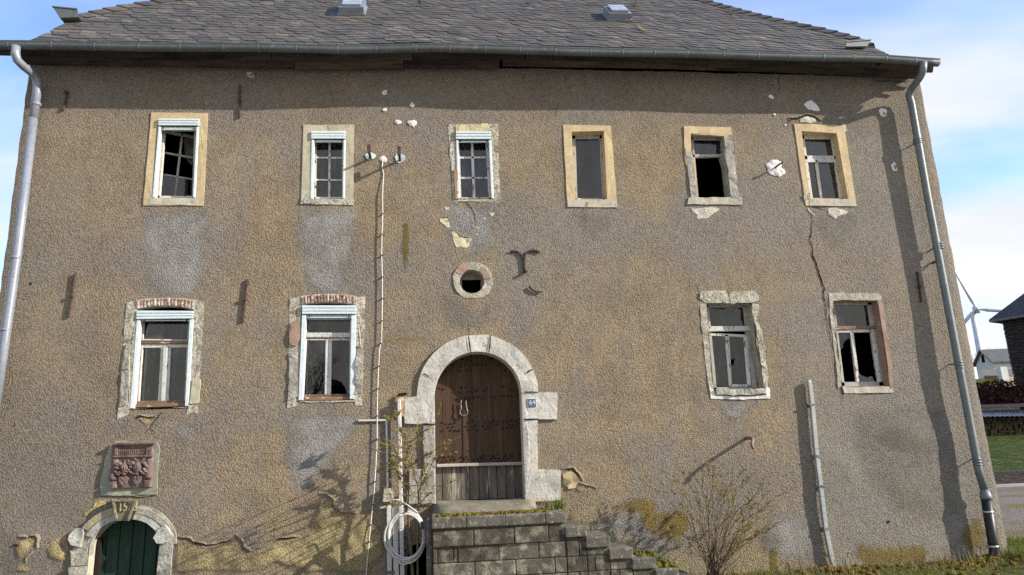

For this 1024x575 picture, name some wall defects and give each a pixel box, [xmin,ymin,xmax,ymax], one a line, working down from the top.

spalling [787,113,822,123]
flaking render [440,207,494,248]
flaking render [691,207,719,219]
flaking render [828,208,848,218]
damp [147,216,202,293]
damp [302,211,353,289]
crack [807,207,843,401]
spalling [561,465,597,491]
flaking render [12,533,69,571]